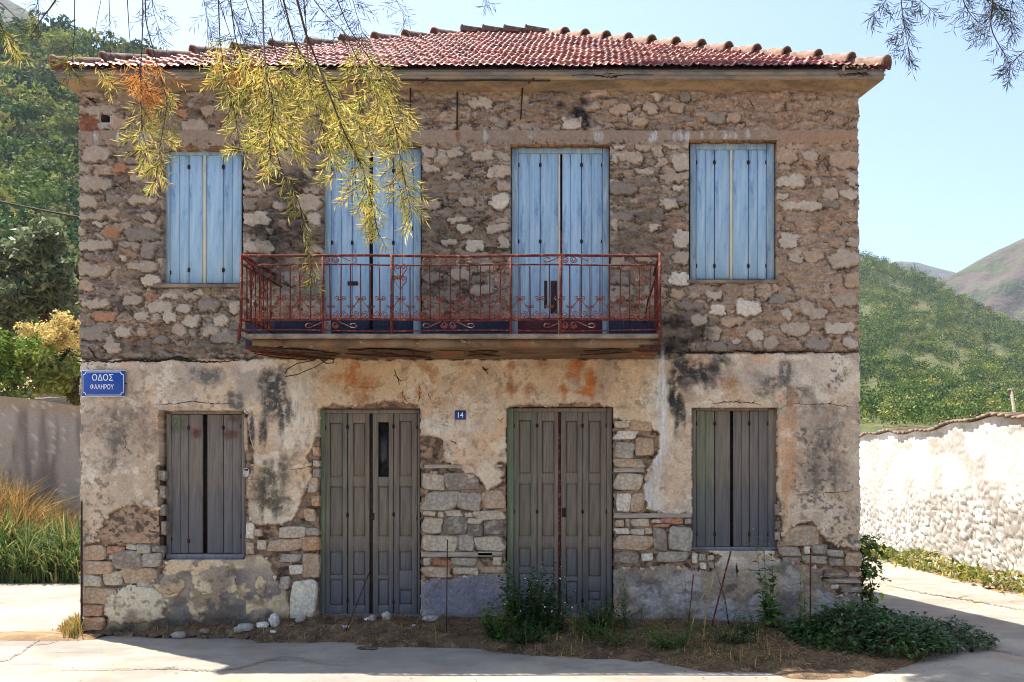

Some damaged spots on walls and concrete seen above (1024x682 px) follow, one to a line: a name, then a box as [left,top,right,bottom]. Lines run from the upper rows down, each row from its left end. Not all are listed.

spalling [79,462,170,631]
leakage [249,416,266,444]
spalling [244,410,323,618]
spalling [419,434,507,583]
corrosion [561,360,596,398]
spalling [612,418,721,573]
spalling [774,499,863,598]